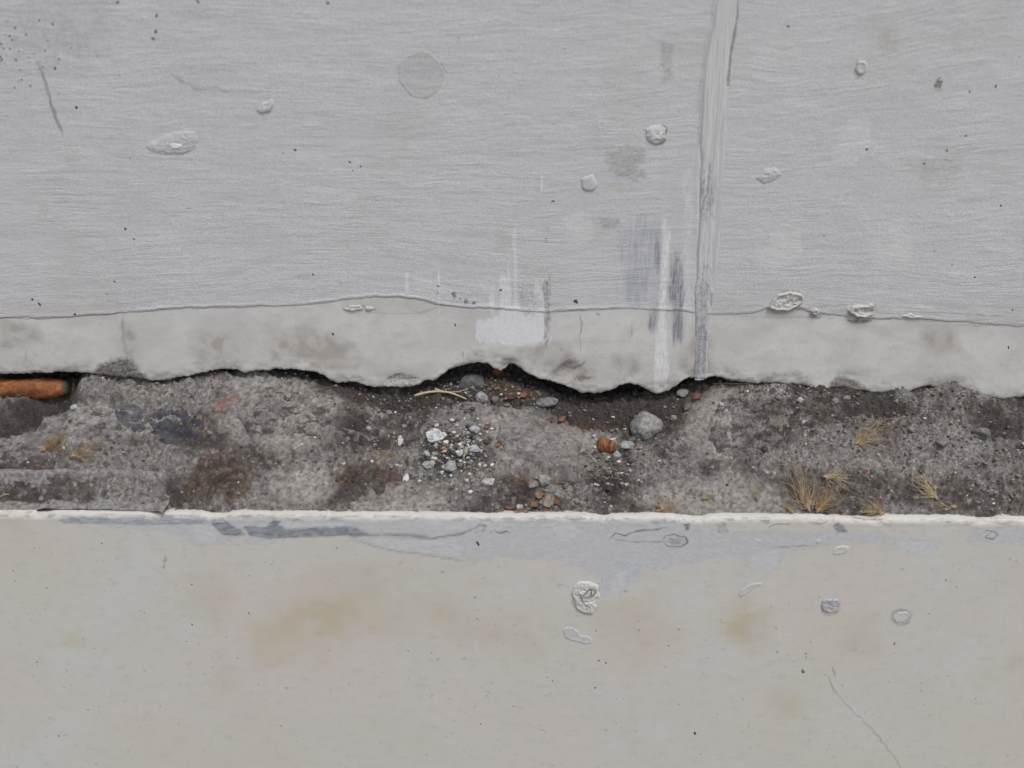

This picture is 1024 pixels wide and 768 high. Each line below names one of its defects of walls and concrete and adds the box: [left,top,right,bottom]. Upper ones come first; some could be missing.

damp [597,86,730,393]
crack [827,667,901,768]